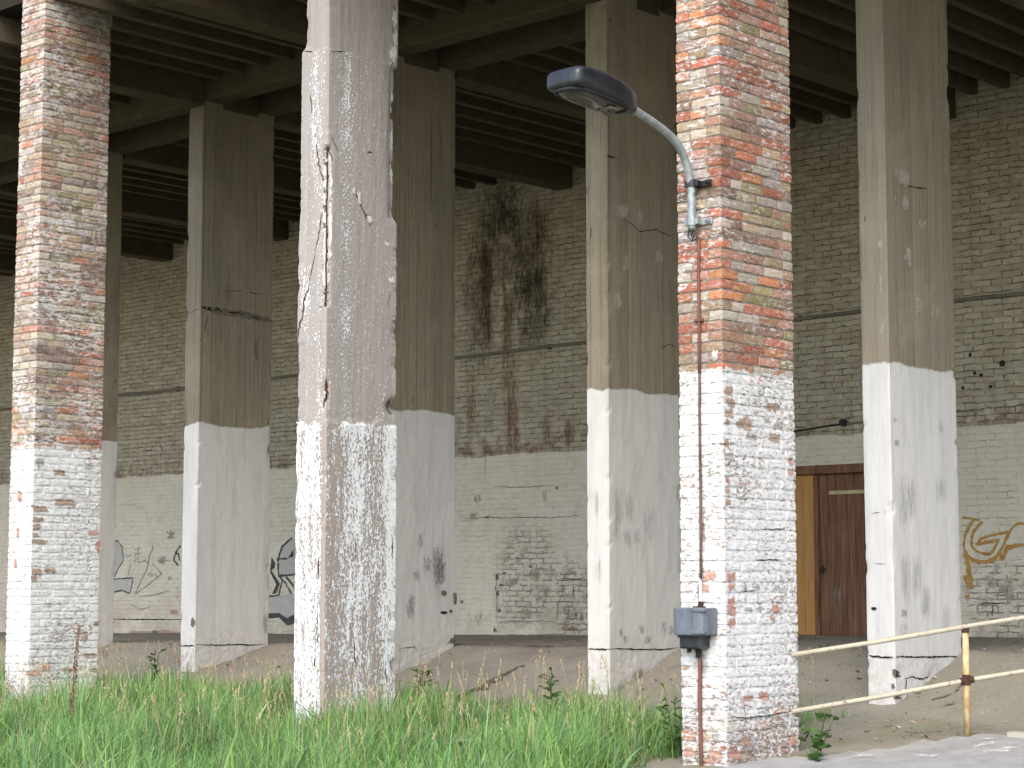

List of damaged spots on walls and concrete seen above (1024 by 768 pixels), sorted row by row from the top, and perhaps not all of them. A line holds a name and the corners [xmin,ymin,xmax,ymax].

crack [298,96,338,344]
crack [188,290,273,333]
peeling [294,8,398,724]
peeling [724,386,783,442]
peeling [16,458,76,544]
peeling [31,568,56,581]
peeling [702,571,782,627]
peeling [26,621,100,676]
peeling [743,692,770,701]
peeling [683,737,751,765]